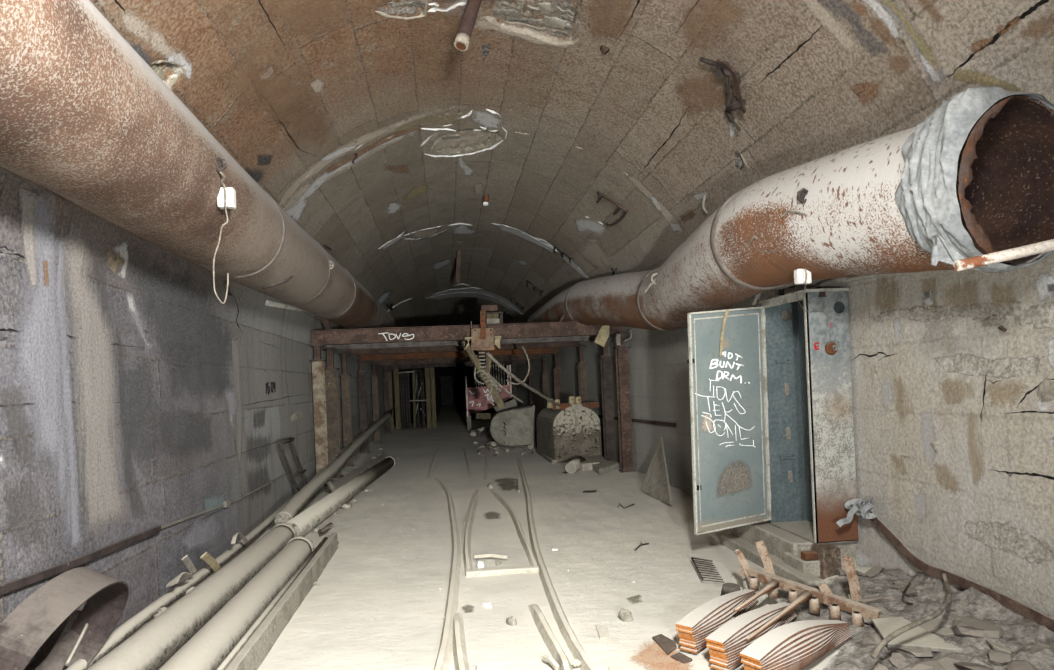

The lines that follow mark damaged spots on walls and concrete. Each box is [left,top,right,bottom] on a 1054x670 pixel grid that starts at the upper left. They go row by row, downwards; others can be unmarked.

spalling [375,0,429,20]
spalling [484,0,580,47]
crack [760,25,822,83]
crack [947,0,1049,77]
spalling [421,127,507,157]
crack [637,110,687,179]
damp [0,190,270,548]
crack [852,352,895,361]
crack [980,376,1054,421]
crack [994,470,1054,480]